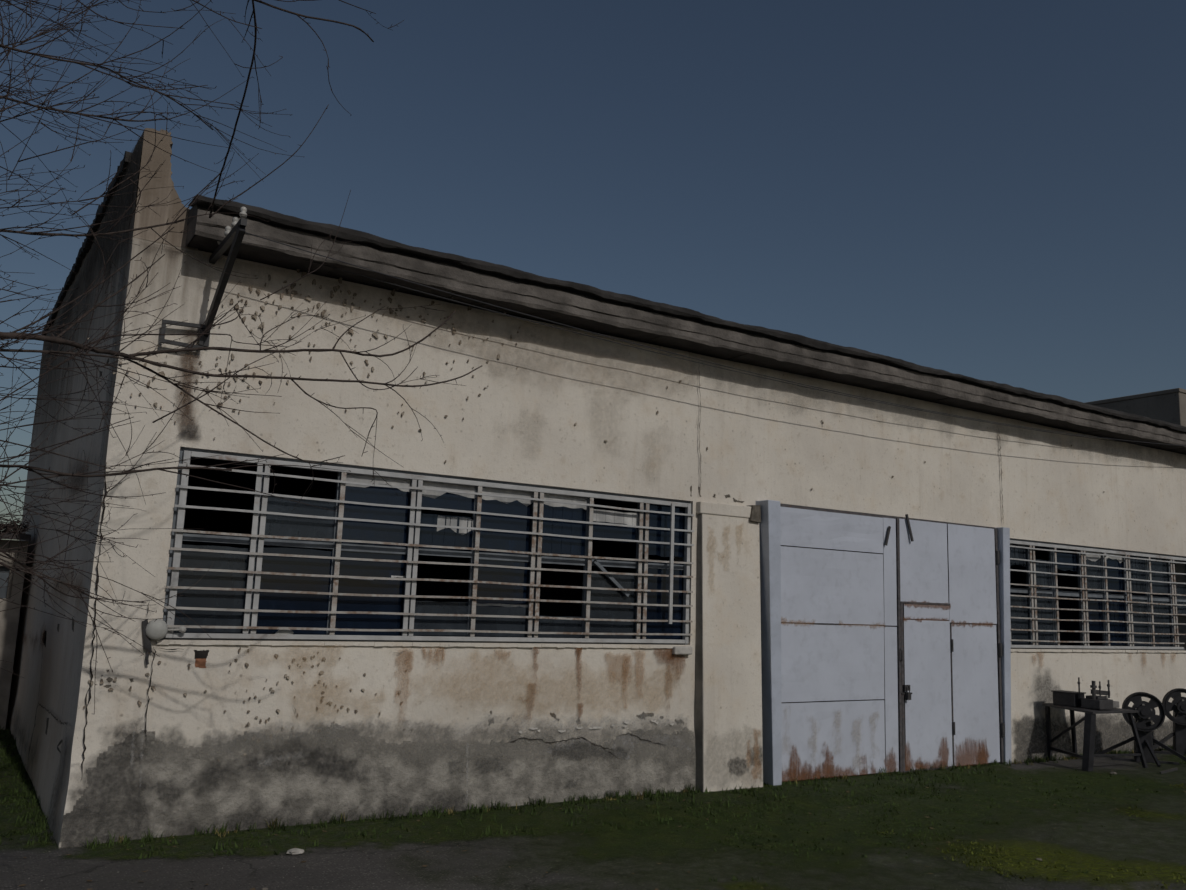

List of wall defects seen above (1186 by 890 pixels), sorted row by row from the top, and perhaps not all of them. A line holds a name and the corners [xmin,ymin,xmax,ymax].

rust [613,649,685,695]
rust [782,739,989,782]
damp [48,723,696,848]